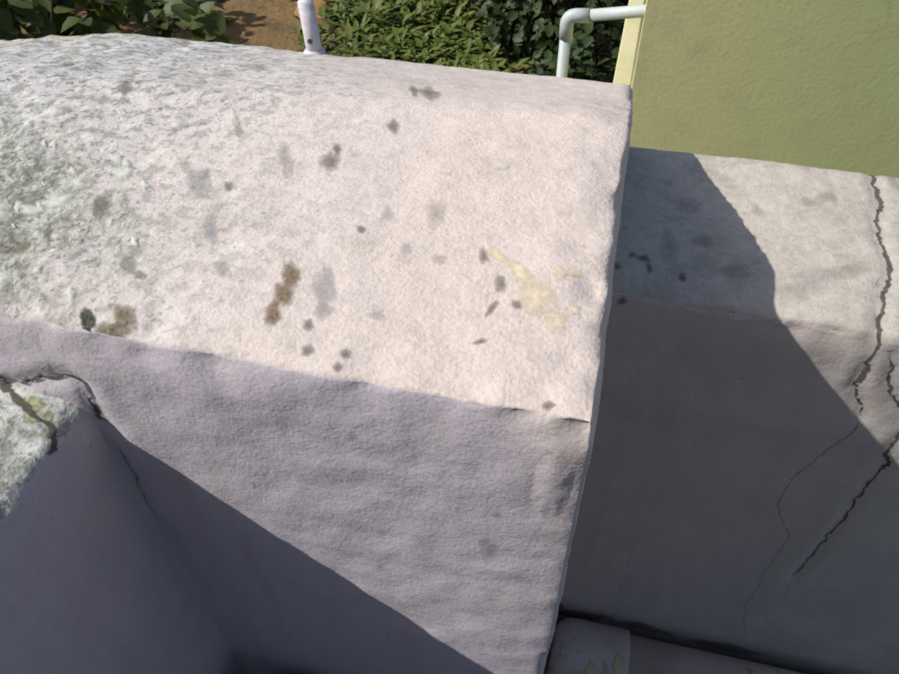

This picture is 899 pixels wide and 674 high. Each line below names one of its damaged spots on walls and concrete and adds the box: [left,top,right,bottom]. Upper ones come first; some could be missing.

leakage [323,146,340,166]
leakage [79,308,95,331]
crack [853,175,899,413]
crack [0,373,109,455]
crack [794,432,899,574]